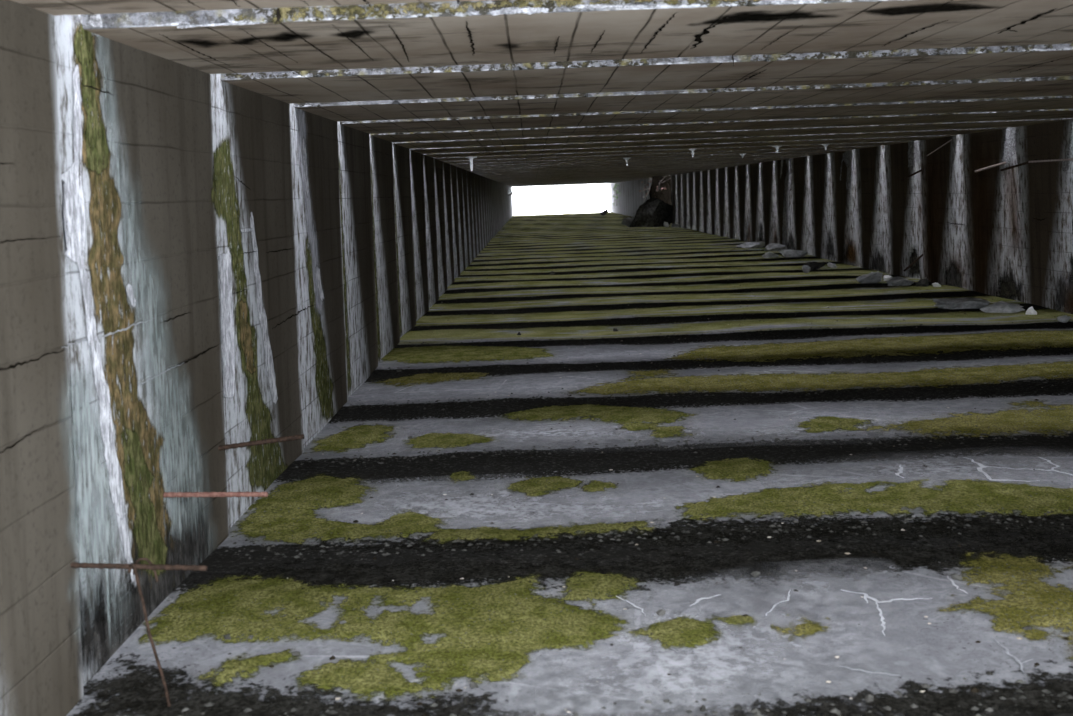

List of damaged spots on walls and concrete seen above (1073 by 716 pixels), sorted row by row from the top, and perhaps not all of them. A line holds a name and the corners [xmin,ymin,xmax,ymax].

crack [159,34,230,66]
crack [231,0,374,63]
crack [363,0,409,62]
crack [457,0,475,55]
crack [641,13,676,54]
crack [691,16,727,49]
crack [732,25,802,83]
crack [964,457,1073,482]
crack [843,590,931,636]